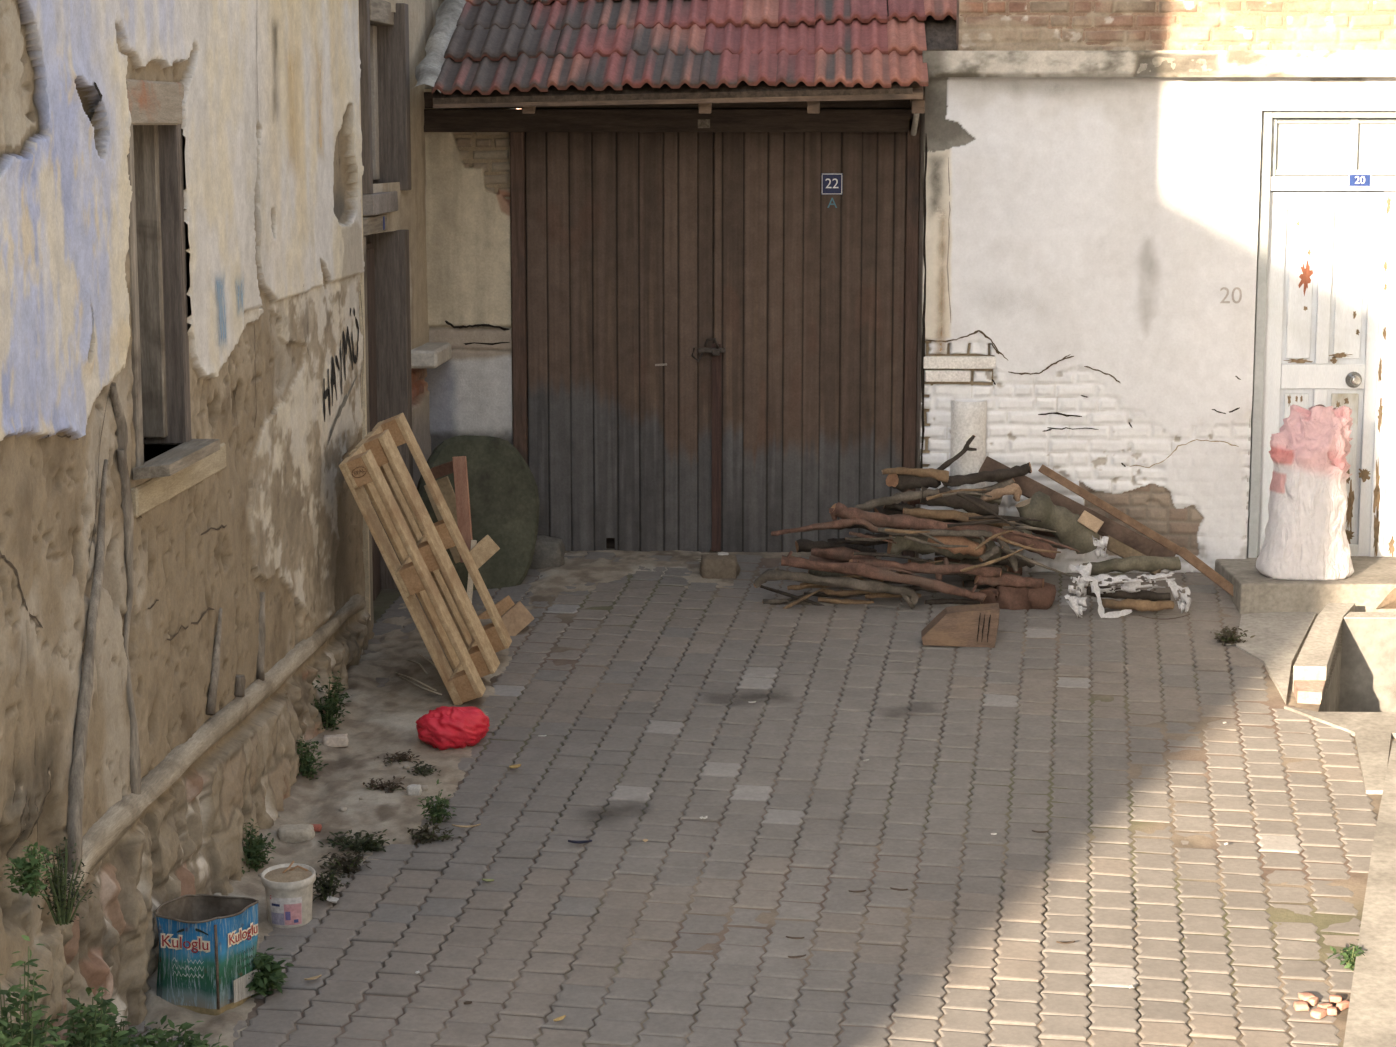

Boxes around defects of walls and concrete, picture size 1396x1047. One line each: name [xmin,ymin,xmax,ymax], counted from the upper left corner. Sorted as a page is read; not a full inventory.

spalling [0,0,42,167]
spalling [74,79,105,156]
spalling [333,125,363,292]
crack [920,134,1132,468]
crack [1121,376,1241,468]
peeling [1079,481,1203,556]